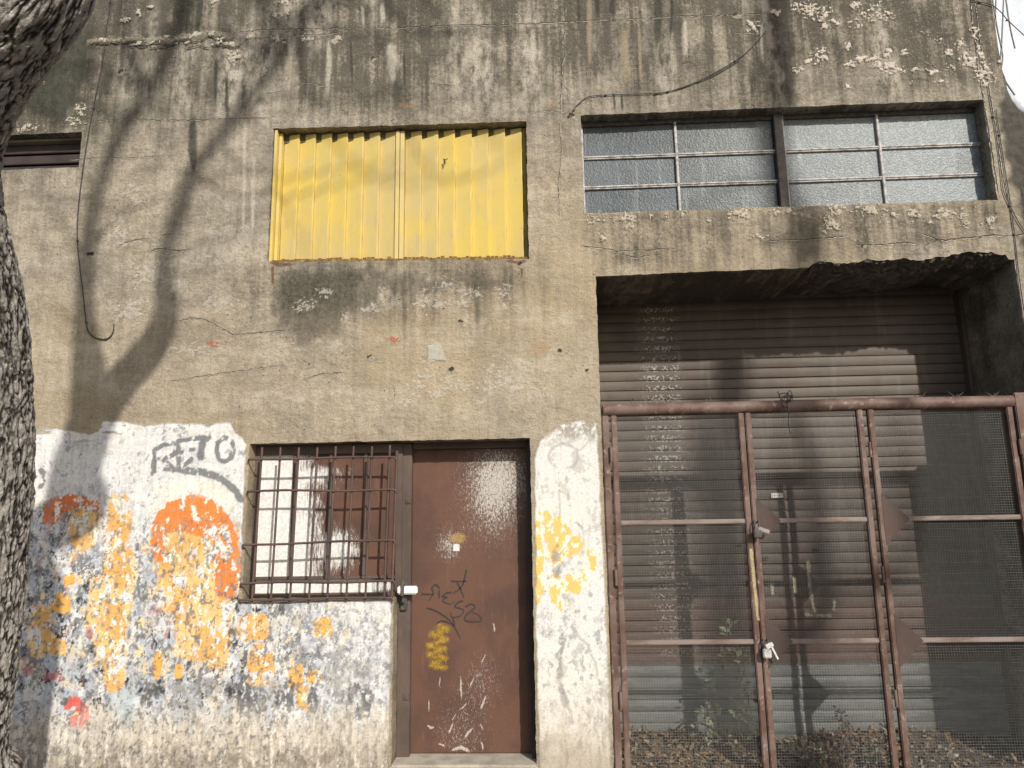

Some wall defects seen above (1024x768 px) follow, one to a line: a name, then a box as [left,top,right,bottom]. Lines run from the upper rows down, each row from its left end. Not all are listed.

water stain [655,0,688,51]
flaking render [770,0,895,29]
water stain [27,16,94,117]
peeling [87,29,253,66]
water stain [326,39,353,88]
water stain [387,45,405,83]
flaking render [843,23,1002,87]
flaking render [769,201,997,234]
crack [766,232,1024,253]
crack [171,308,284,335]
crack [169,364,342,382]
peeling [9,446,391,768]